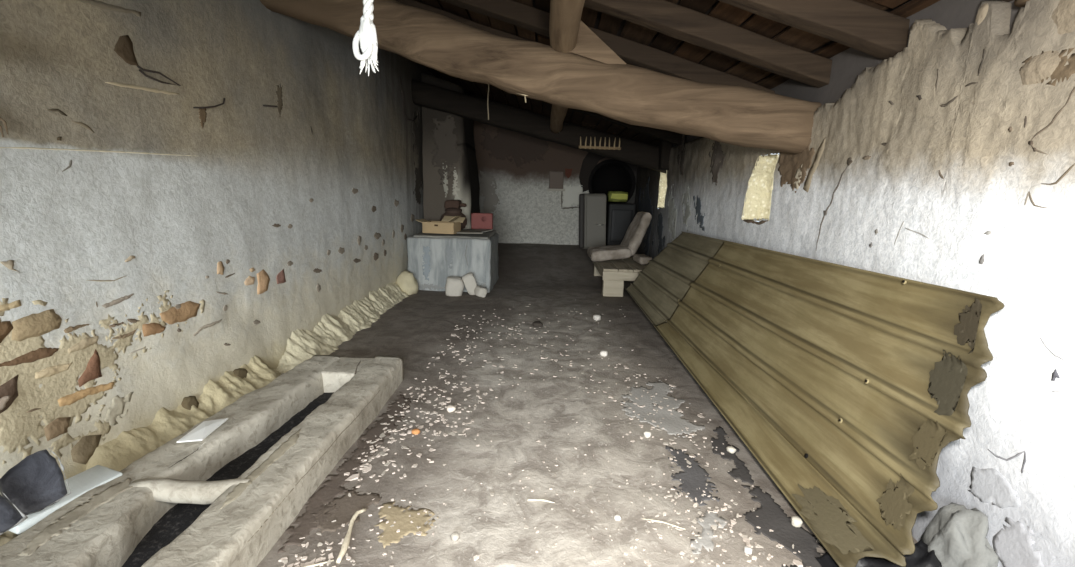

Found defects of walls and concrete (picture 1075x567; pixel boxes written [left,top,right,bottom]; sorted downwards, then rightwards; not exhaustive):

crack [1024,87,1075,154]
flaking render [778,125,815,193]
crack [816,166,848,250]
crack [1024,163,1075,208]
flaking render [205,259,230,279]
flaking render [244,261,293,294]
flaking render [0,290,227,465]
crack [988,449,1026,473]